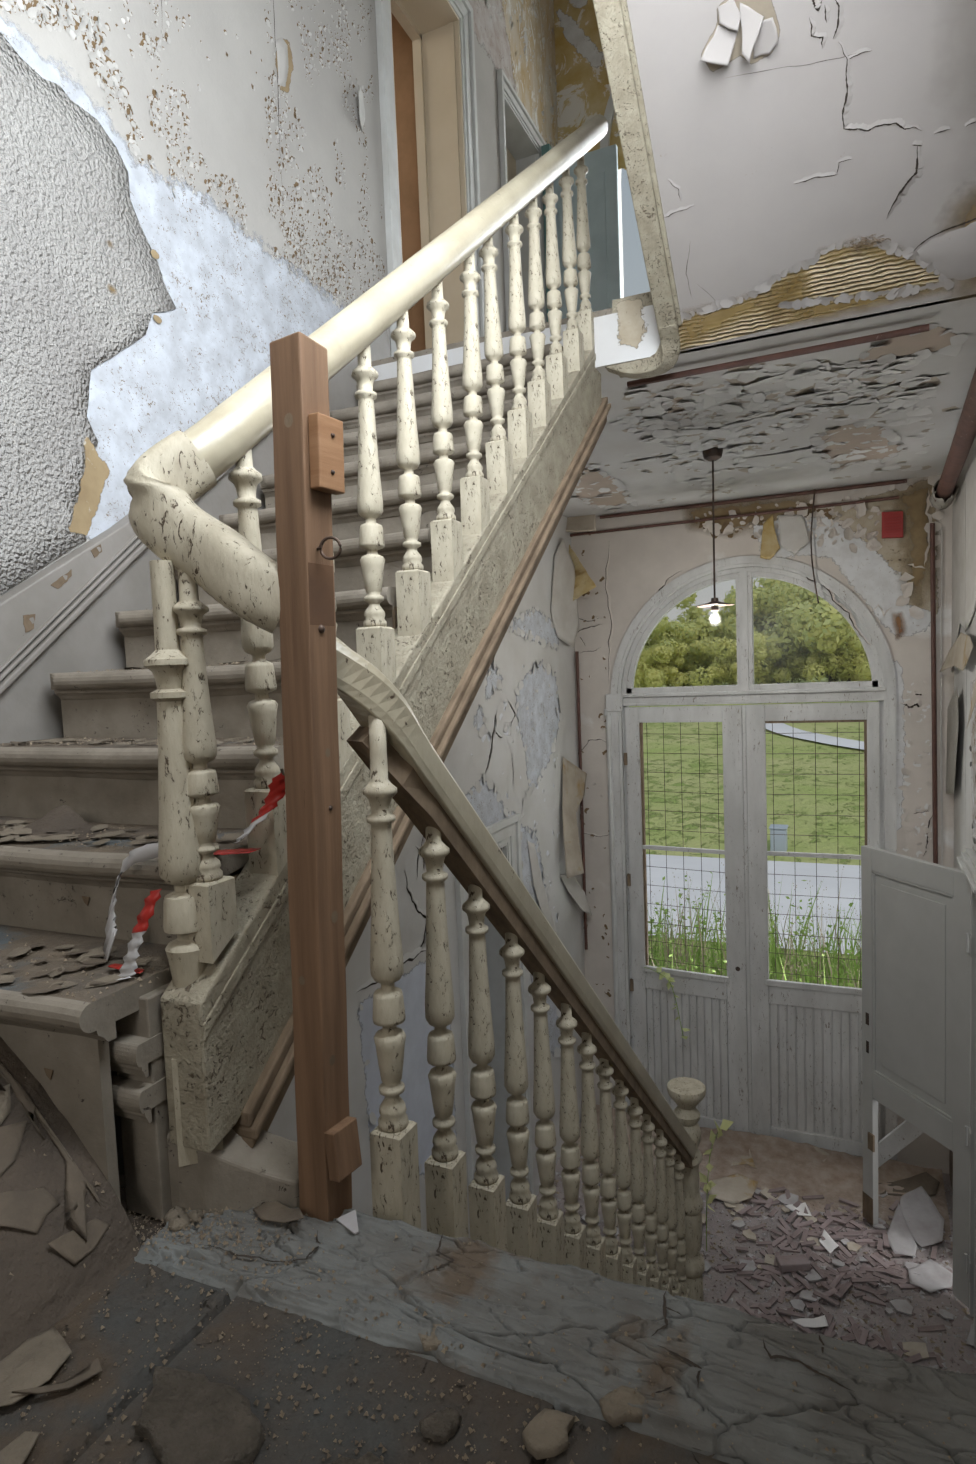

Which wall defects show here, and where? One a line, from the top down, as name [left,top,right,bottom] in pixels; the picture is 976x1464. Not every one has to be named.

peeling [700,0,780,72]
crack [728,0,976,219]
crack [920,218,976,245]
leakage [959,199,976,229]
flaking render [0,0,385,558]
peeling [571,324,968,637]
peeling [466,604,609,923]
peeling [529,976,561,1057]
crack [423,1234,455,1275]
crack [652,1286,702,1393]
crack [763,1335,855,1392]